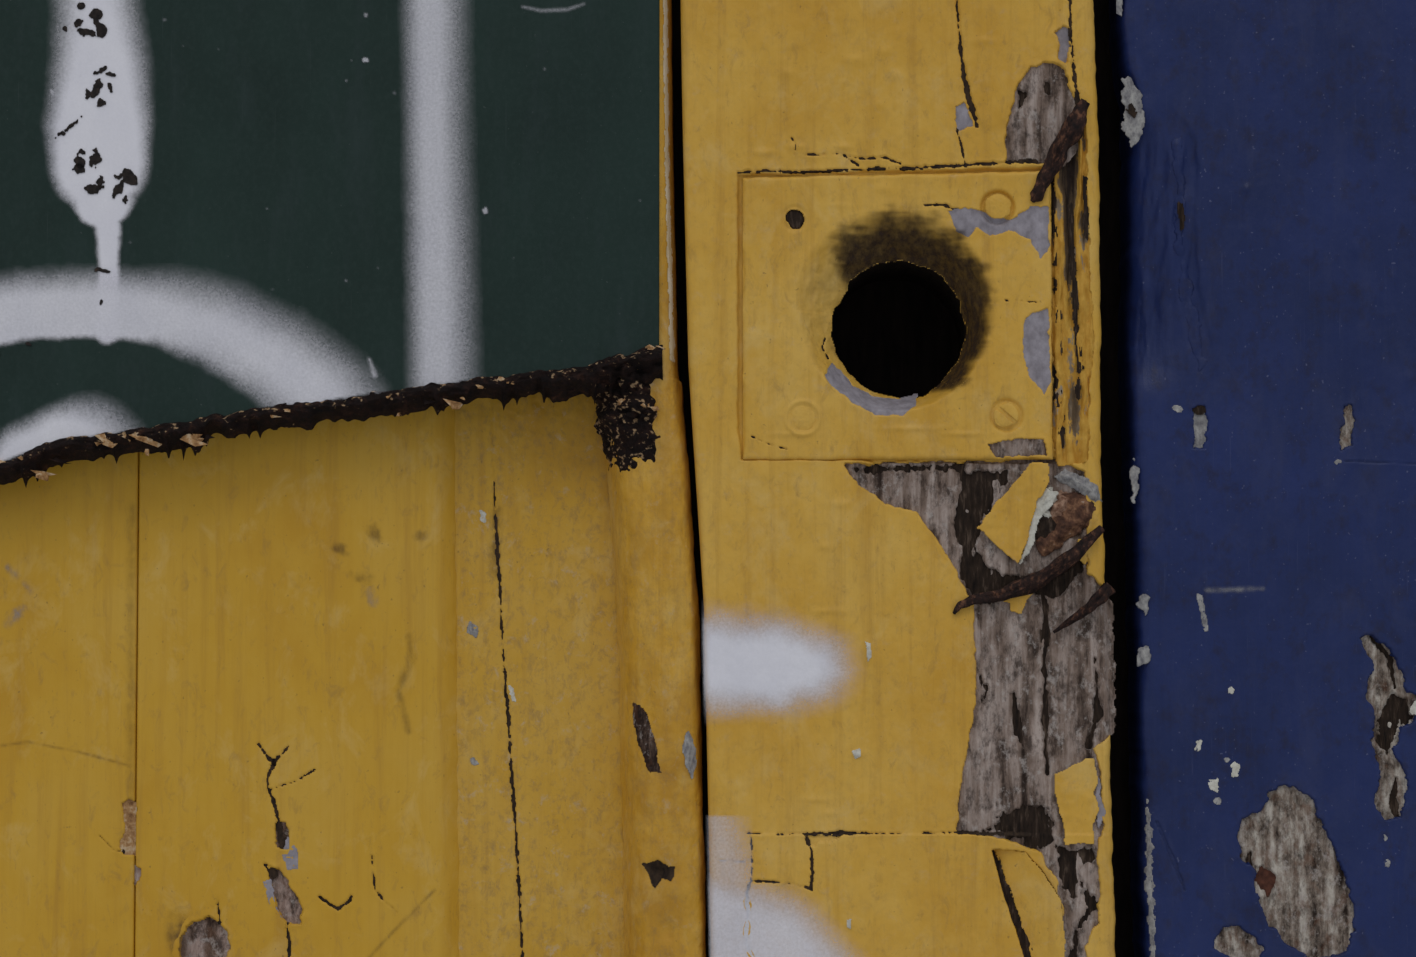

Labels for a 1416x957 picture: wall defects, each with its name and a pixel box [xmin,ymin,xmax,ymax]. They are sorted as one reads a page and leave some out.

crack [737,0,1038,174]
peeling [1005,63,1078,167]
peeling [1121,76,1145,148]
peeling [924,203,1050,259]
peeling [1023,308,1051,394]
peeling [1129,458,1140,504]
peeling [1137,646,1151,667]
peeling [844,459,1117,957]
peeling [1360,635,1416,841]
peeling [1237,785,1355,957]
peeling [177,902,231,957]
peeling [1214,926,1264,957]